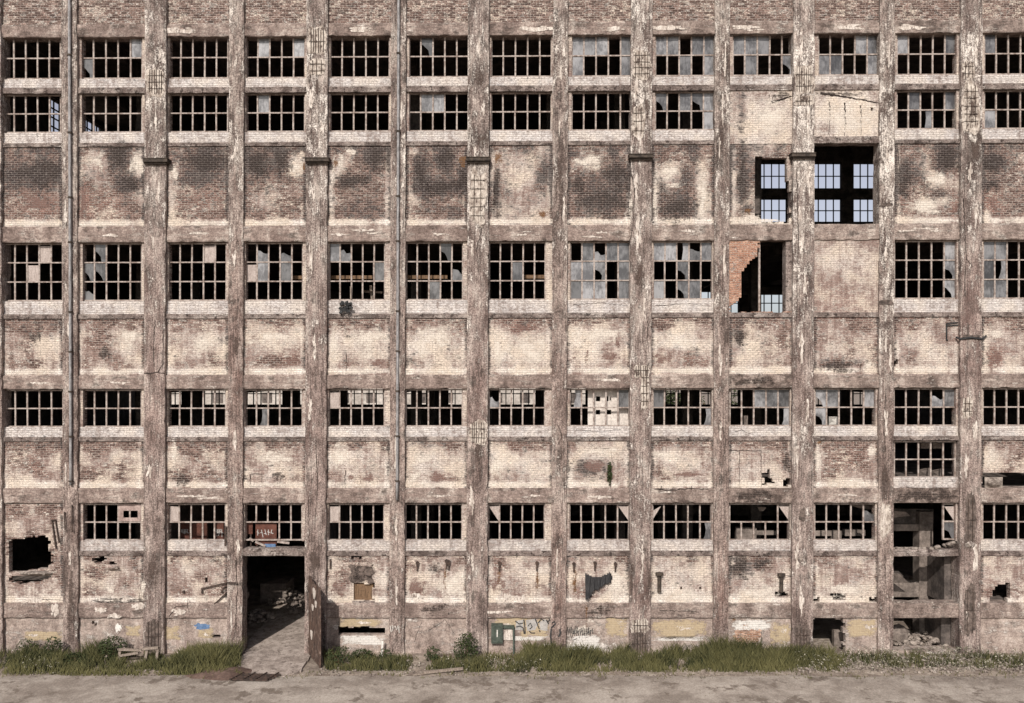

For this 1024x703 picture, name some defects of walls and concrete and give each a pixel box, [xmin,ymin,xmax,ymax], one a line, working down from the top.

damp [90,140,145,192]
damp [556,155,633,225]
damp [653,166,709,225]
peeling [331,564,375,597]